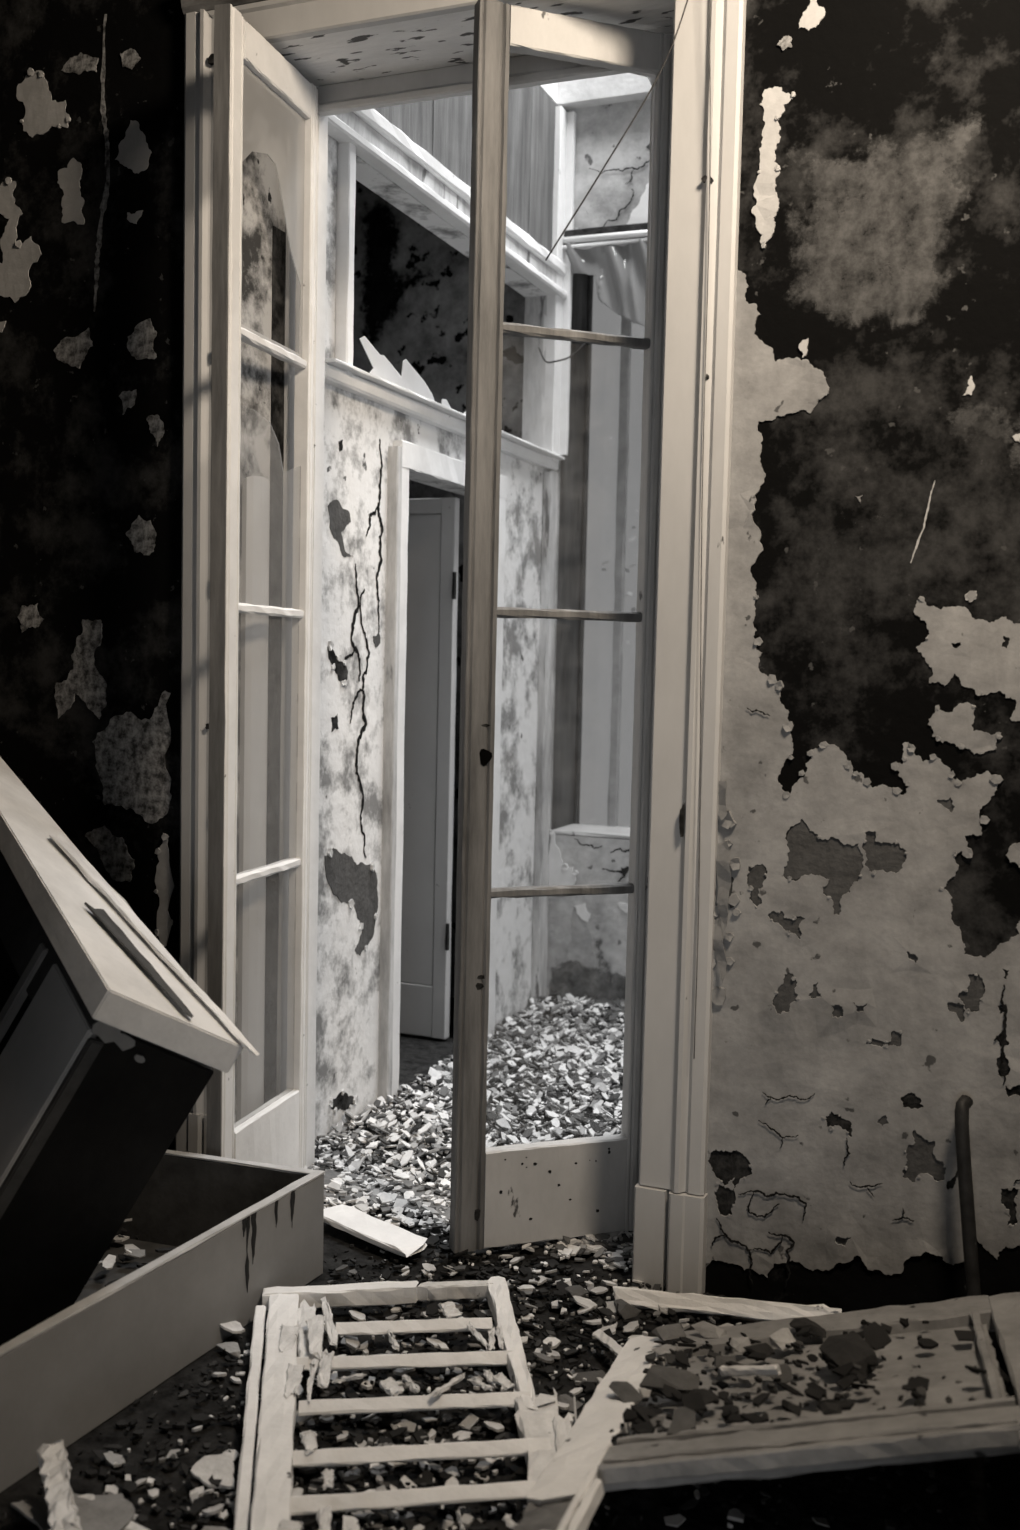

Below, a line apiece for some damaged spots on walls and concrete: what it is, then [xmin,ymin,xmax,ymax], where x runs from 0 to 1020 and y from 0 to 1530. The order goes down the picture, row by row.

peeling [777,0,825,51]
peeling [16,52,99,138]
peeling [751,86,796,249]
peeling [0,177,42,303]
crack [341,439,384,858]
peeling [54,619,174,947]
peeling [706,270,1020,1278]
spalling [325,848,378,956]
crack [574,838,629,882]
crack [758,1093,815,1149]
crack [843,1138,914,1222]
crack [711,1190,807,1288]